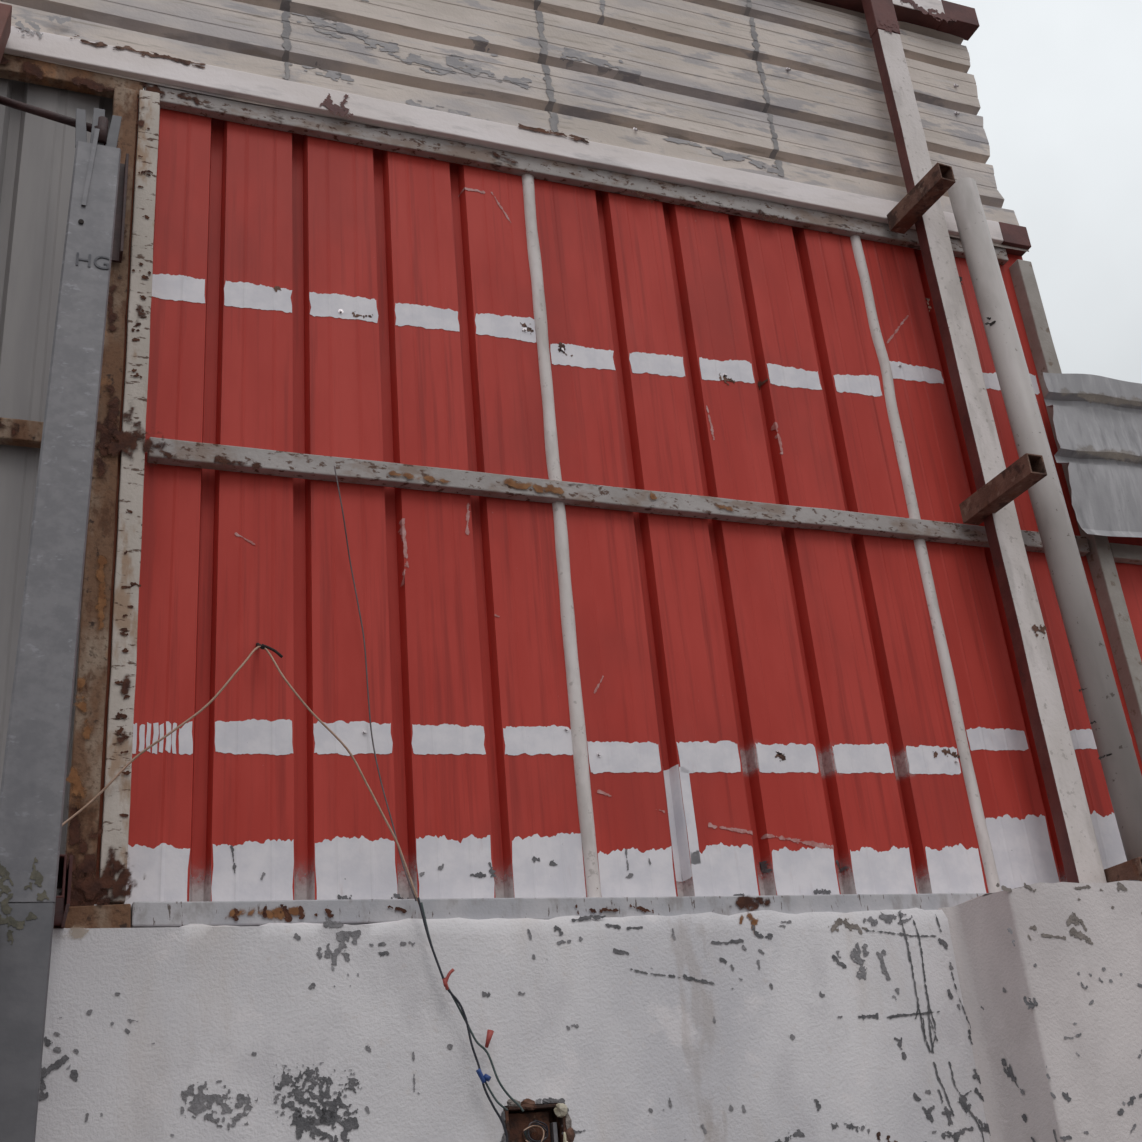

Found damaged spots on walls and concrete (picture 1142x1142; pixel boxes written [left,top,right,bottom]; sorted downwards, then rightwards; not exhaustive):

corrosion [94,385,176,479]
corrosion [115,675,131,776]
corrosion [57,767,145,907]
corrosion [229,904,334,922]
corrosion [729,895,770,928]
peeling [711,920,792,990]
peeling [828,910,913,1000]
peeling [1028,885,1103,945]
crack [866,914,984,1142]
peeling [181,1080,258,1131]
peeling [274,1062,370,1142]
peeling [913,1069,991,1142]